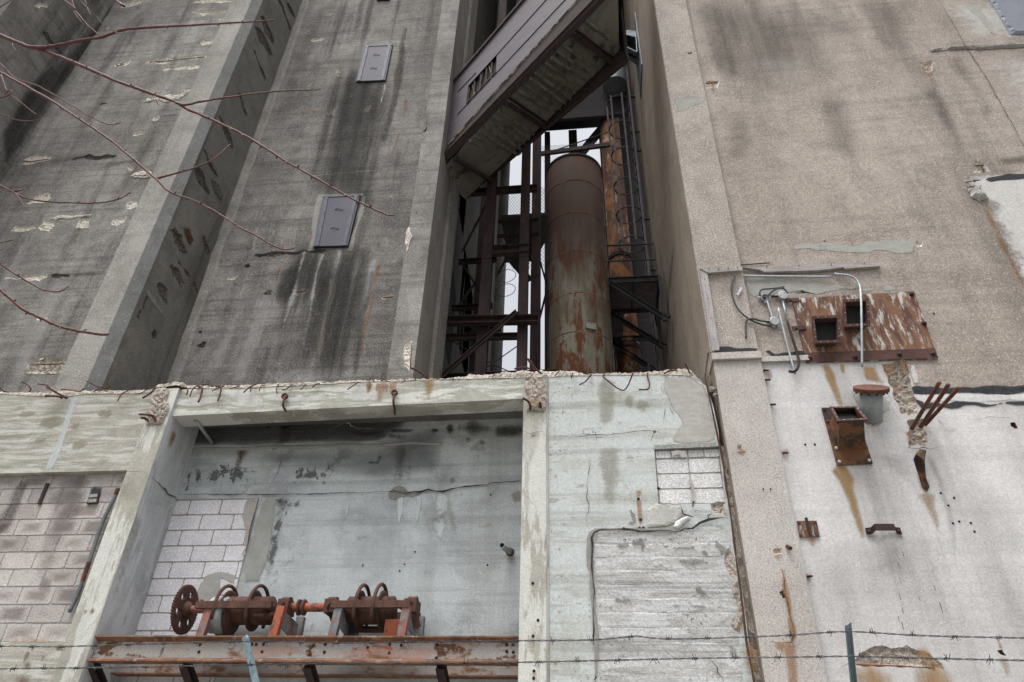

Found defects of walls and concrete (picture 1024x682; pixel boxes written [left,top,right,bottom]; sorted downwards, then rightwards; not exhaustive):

spalling [11,214,92,232]
water stain [278,45,403,369]
spalling [137,227,210,320]
rust [824,365,844,403]
spalling [882,360,961,448]
water stain [186,465,253,490]
water stain [295,465,330,484]
crack [128,459,528,549]
spalling [0,341,755,682]
crack [524,386,722,643]
rust [833,466,863,534]
spalling [855,645,944,672]